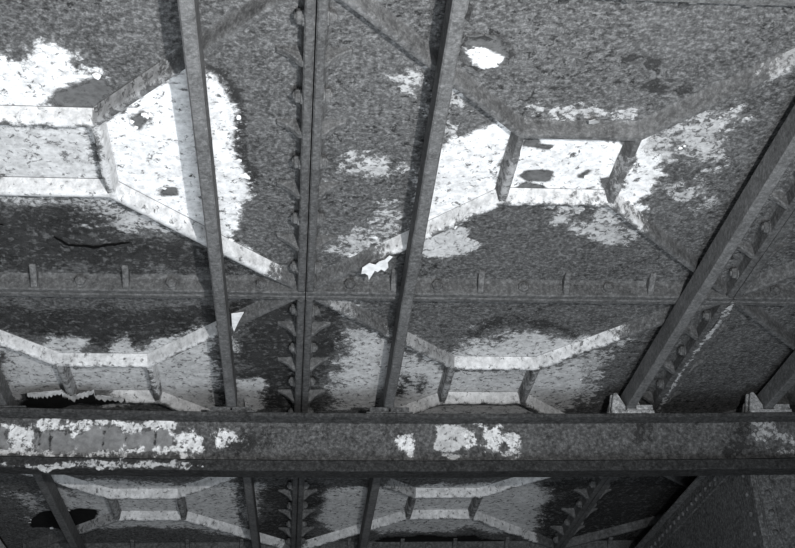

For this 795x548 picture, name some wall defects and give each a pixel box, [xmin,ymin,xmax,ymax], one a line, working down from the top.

spalling [459,33,516,73]
spalling [54,77,114,107]
spalling [386,66,427,109]
spalling [132,111,153,129]
spalling [160,187,179,196]
peeling [422,227,481,259]
peeling [361,256,392,279]
peeling [23,389,126,408]
peeling [0,418,205,459]
peeling [215,428,244,449]
peeling [394,433,415,458]
peeling [433,423,521,460]